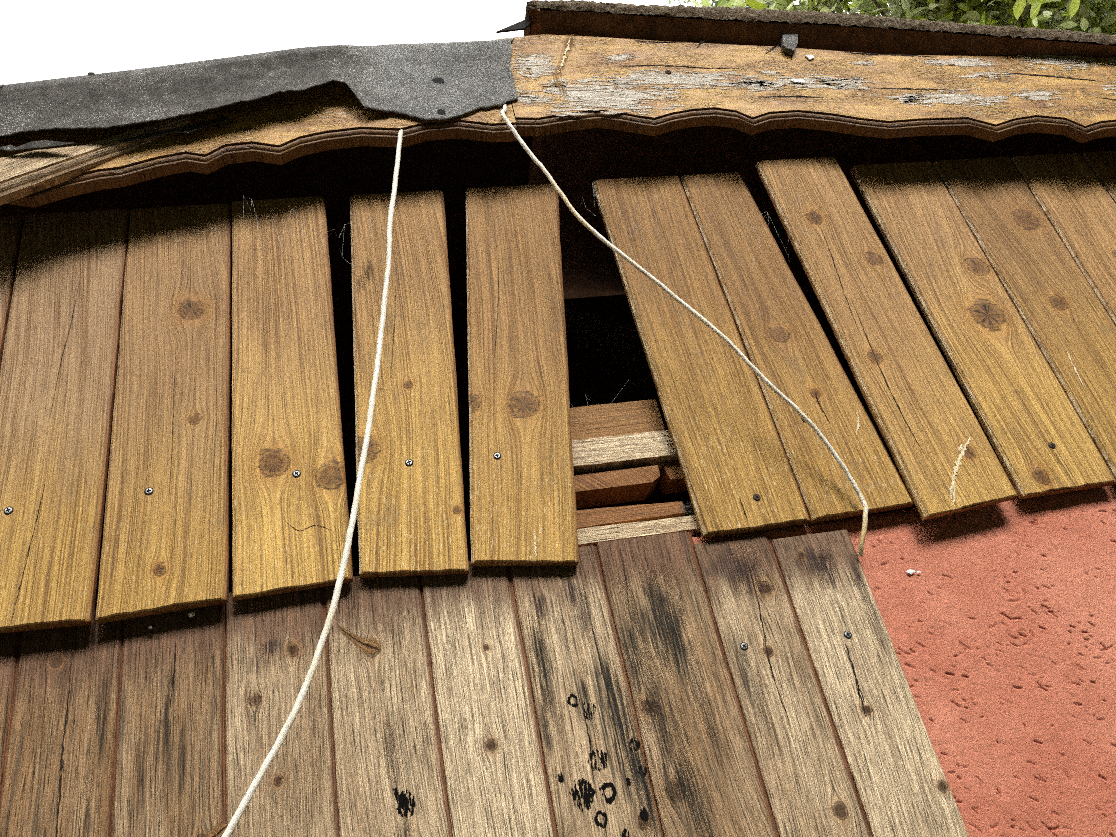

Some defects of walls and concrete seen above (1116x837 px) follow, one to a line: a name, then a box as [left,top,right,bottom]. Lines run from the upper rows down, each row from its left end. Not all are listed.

peeling [886,57,1063,107]
peeling [1017,55,1116,70]
crack [50,282,80,415]
crack [11,485,45,621]
damp [621,583,688,677]
damp [575,642,654,821]
damp [646,685,713,837]